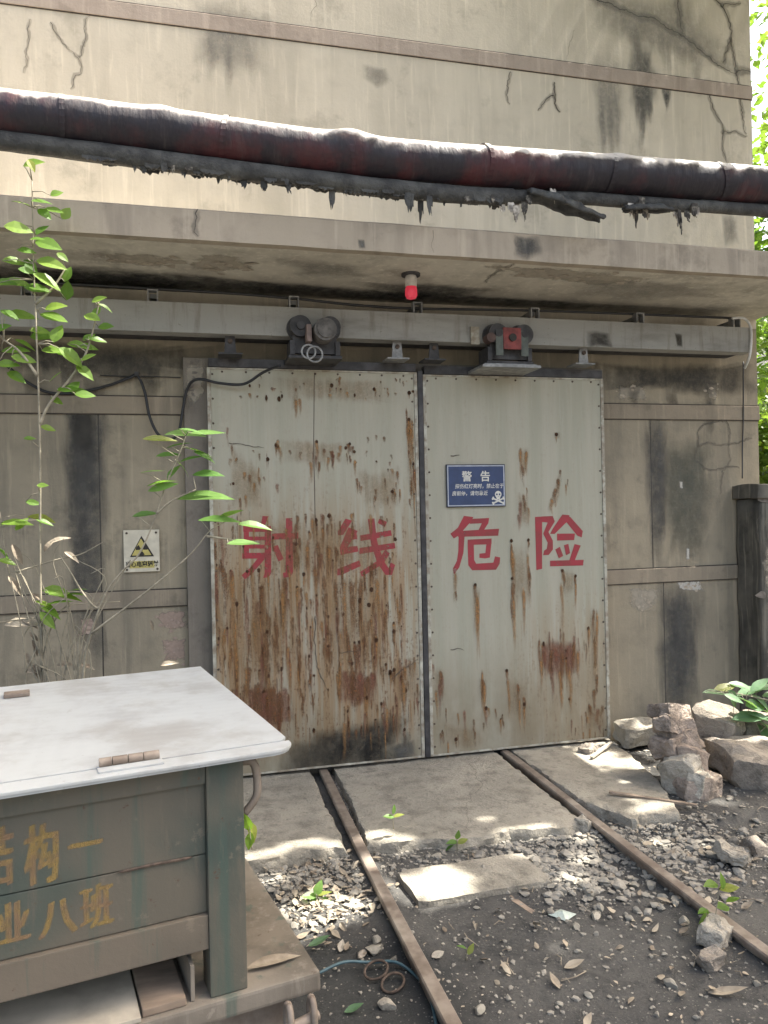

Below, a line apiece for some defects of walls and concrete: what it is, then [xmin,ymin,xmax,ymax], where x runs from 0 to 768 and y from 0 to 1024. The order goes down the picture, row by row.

crack [25,16,89,87]
crack [538,82,560,112]
damp [636,86,669,107]
crack [597,0,754,162]
damp [67,414,102,592]
crack [694,421,746,489]
rust [214,410,421,745]
rust [510,538,531,637]
rust [435,669,526,735]
rust [538,610,604,739]